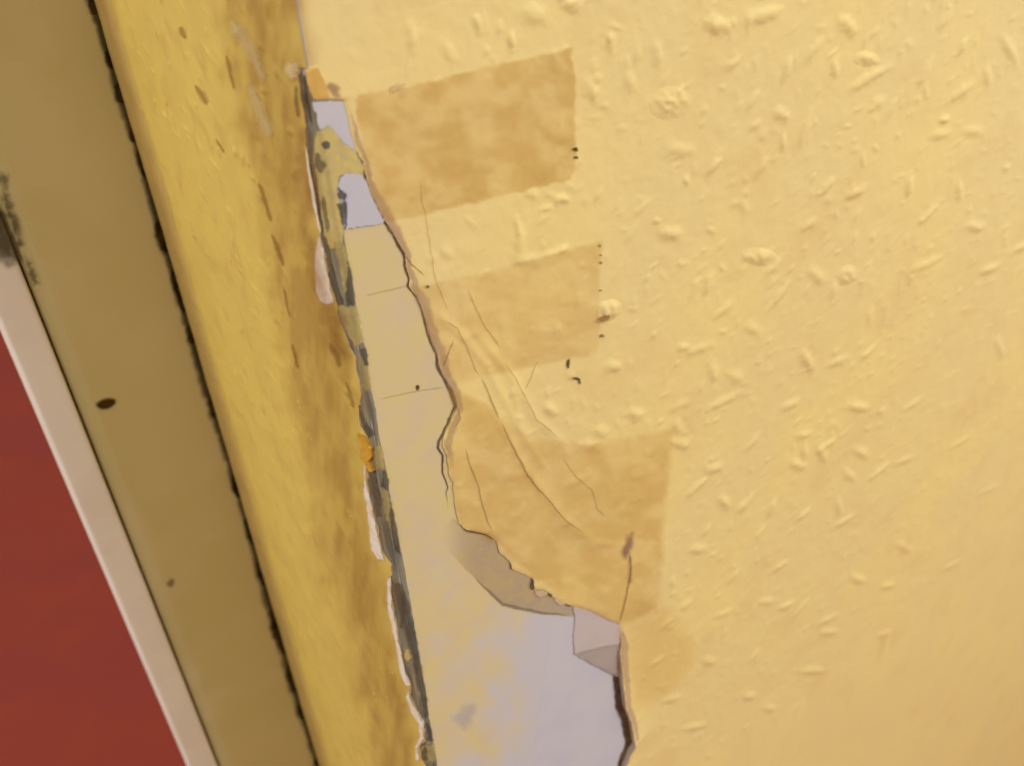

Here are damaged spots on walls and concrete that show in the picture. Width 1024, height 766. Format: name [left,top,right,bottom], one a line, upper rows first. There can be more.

flaking render [312,100,357,172]
flaking render [337,173,384,230]
peeling [323,237,355,305]
peeling [369,470,400,553]
crack [620,554,632,620]
peeling [394,584,433,760]
flaking render [533,615,626,766]